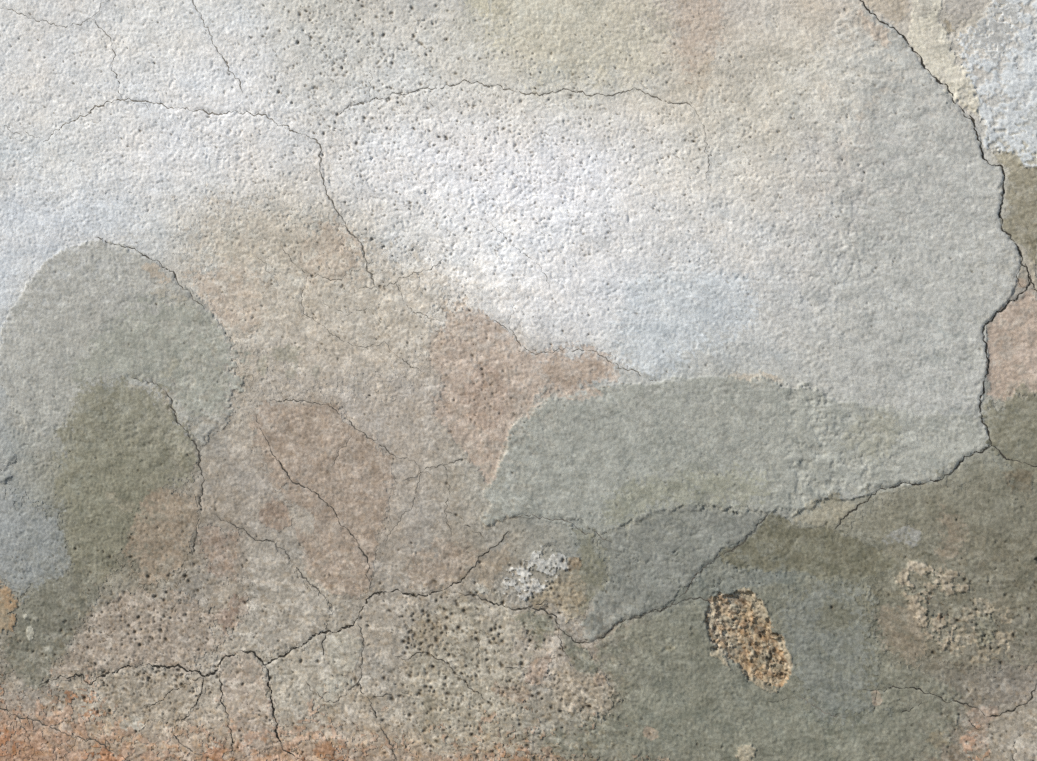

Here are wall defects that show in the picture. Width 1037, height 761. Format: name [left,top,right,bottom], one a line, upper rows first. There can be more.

crack [0,708,129,761]
flaking render [0,235,395,758]
crack [6,0,441,373]
damp [0,171,485,691]
rust [0,665,599,761]
crack [40,377,767,761]
crack [340,64,710,170]
flaking render [370,0,1037,761]
damp [472,418,1037,761]
damp [834,405,904,468]
crack [836,0,1037,527]
crack [863,686,1036,730]